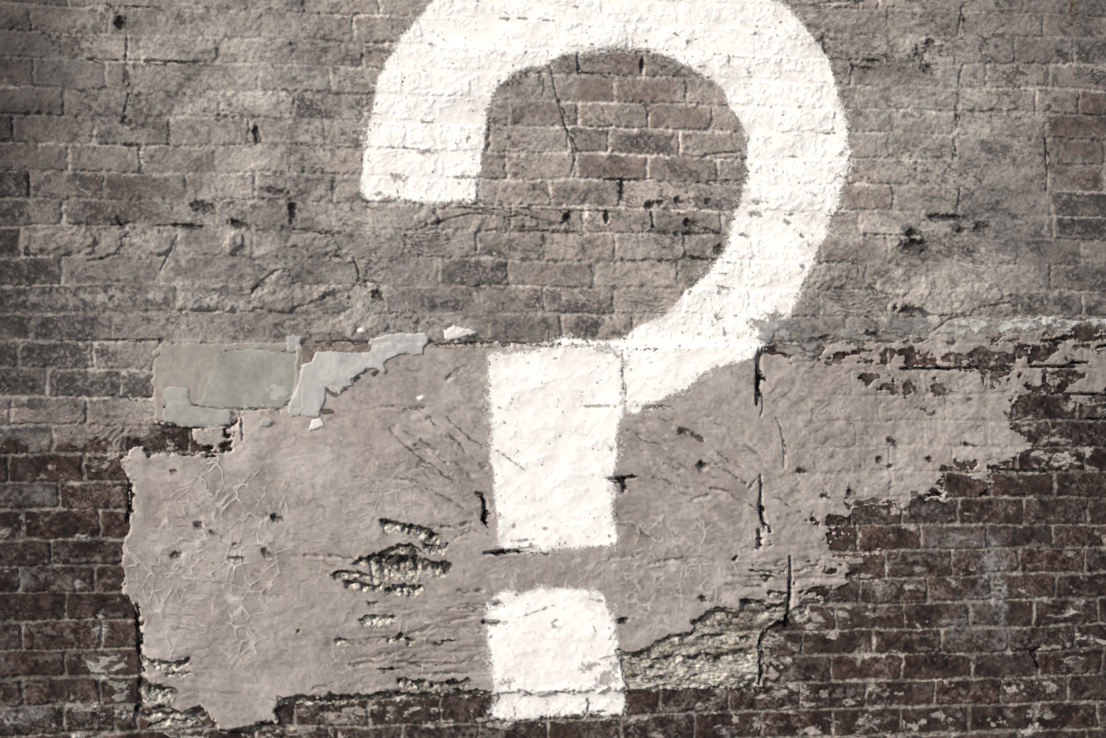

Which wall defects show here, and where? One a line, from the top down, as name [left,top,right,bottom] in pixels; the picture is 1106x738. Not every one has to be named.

spalling [899,213,990,258]
peeling [286,326,494,431]
crack [434,339,559,347]
crack [755,337,833,406]
peeling [756,304,1106,363]
flaking render [1021,415,1098,472]
spalling [329,518,458,648]
crack [325,481,817,687]
spalling [615,565,849,738]
flaking render [1060,630,1106,667]
spalling [261,667,492,738]
flaking render [1019,681,1057,736]